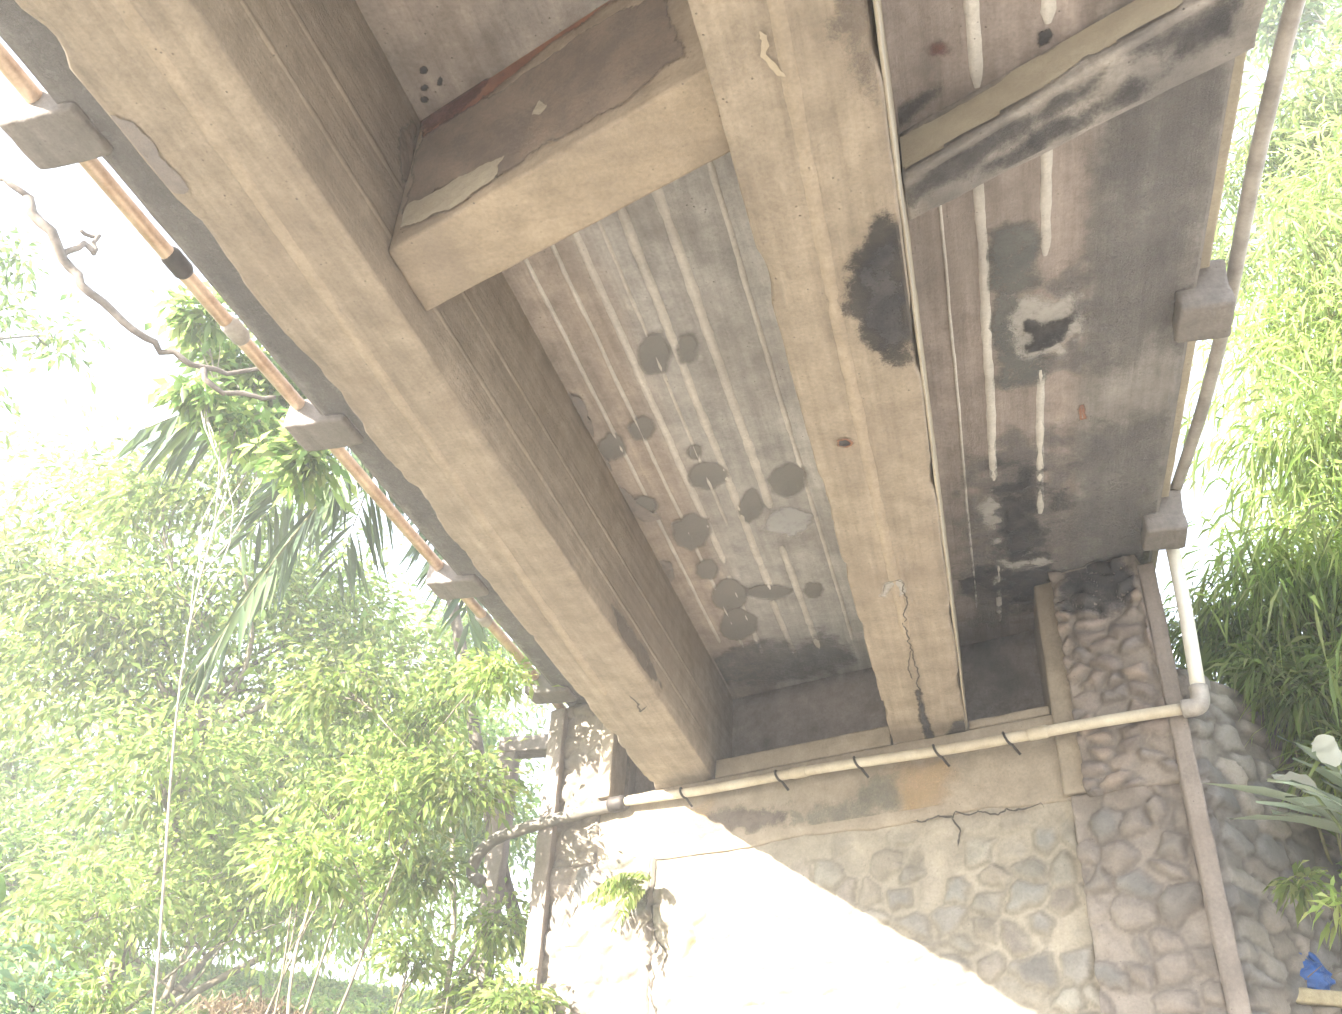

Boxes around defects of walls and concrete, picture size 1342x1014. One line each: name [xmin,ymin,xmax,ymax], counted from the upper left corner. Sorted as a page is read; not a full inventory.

peeling [399,0,684,228]
water stain [639,335,697,375]
water stain [841,212,914,367]
hole [1009,271,1085,373]
water stain [908,68,1224,390]
water stain [739,463,812,536]
water stain [955,418,1166,624]
water stain [673,514,852,686]
crack [882,580,935,739]
water stain [666,777,896,839]
crack [911,802,1044,845]
crack [646,862,667,1014]